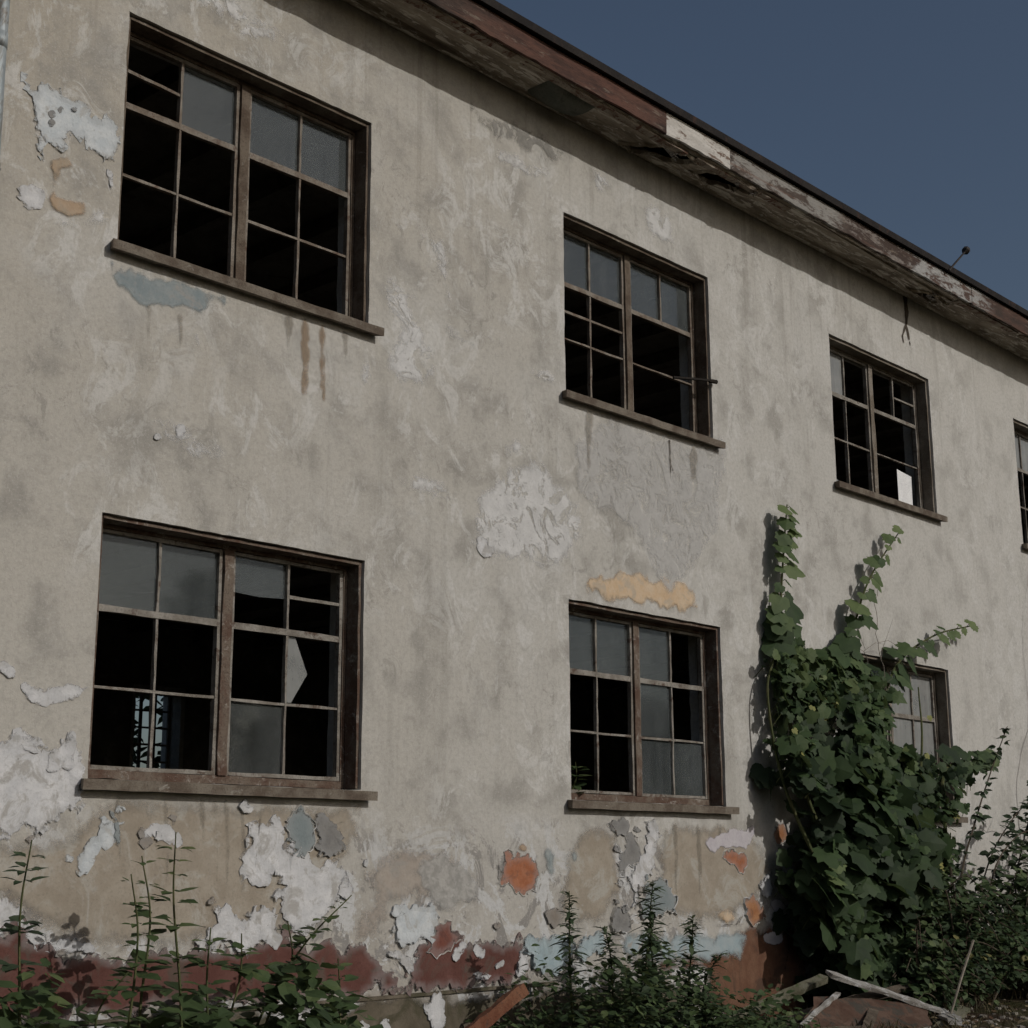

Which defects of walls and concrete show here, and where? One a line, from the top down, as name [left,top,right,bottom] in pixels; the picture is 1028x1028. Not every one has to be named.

peeling [20,72,122,187]
peeling [488,122,556,175]
peeling [16,184,104,221]
damp [112,263,226,311]
peeling [476,422,725,611]
peeling [0,660,88,707]
peeling [0,727,813,1028]